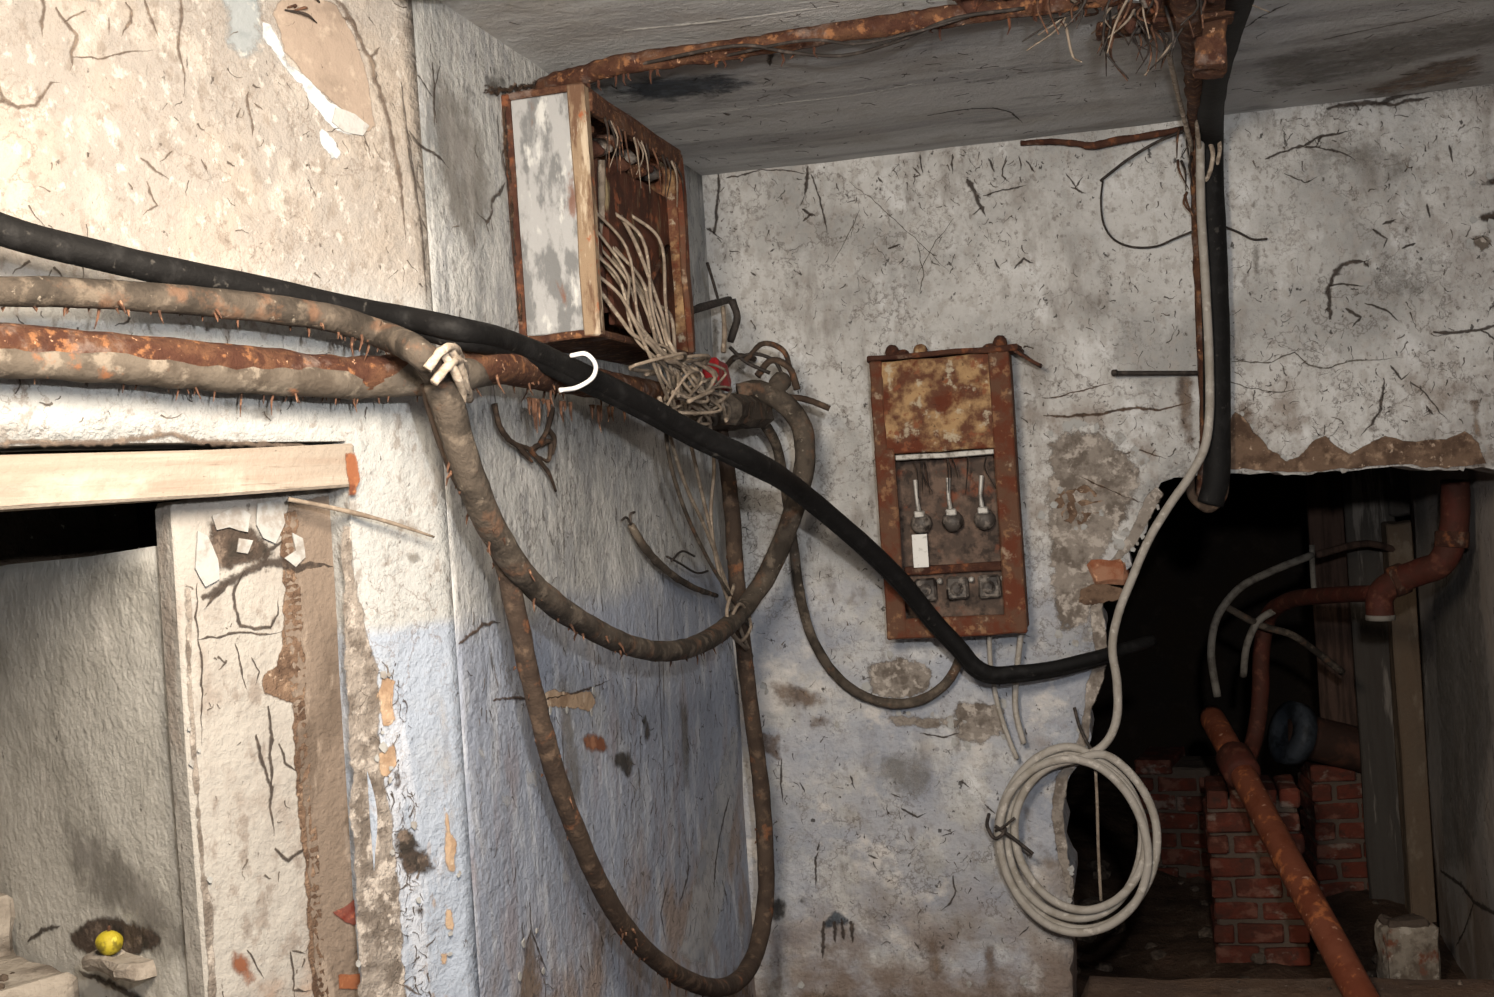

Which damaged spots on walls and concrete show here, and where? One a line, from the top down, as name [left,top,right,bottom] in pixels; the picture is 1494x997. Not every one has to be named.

crack [0,0,185,109]
flaking render [223,0,376,159]
crack [335,0,447,296]
crack [1265,93,1430,183]
crack [1231,204,1447,435]
crack [1433,325,1494,360]
flaking render [1231,409,1487,473]
flaking render [1037,418,1163,747]
crack [194,541,333,862]
flaking render [185,495,462,997]
flaking render [1051,764,1076,904]
flaking render [518,928,545,997]